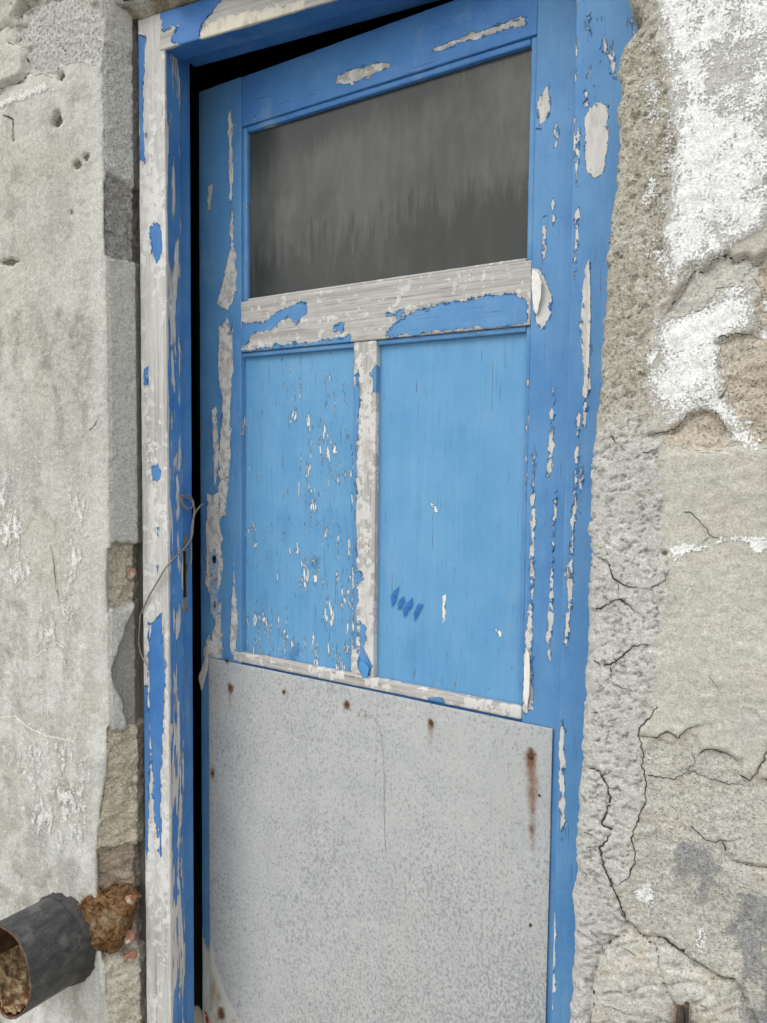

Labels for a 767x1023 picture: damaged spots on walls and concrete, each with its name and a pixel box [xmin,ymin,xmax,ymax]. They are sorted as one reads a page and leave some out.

peeling [632,0,767,458]
peeling [386,292,516,330]
peeling [526,270,553,329]
peeling [574,260,592,438]
peeling [198,570,238,691]
peeling [351,602,372,678]
peeling [523,640,534,714]
crack [594,644,651,689]
corrosion [527,749,535,804]
crack [584,706,767,1023]